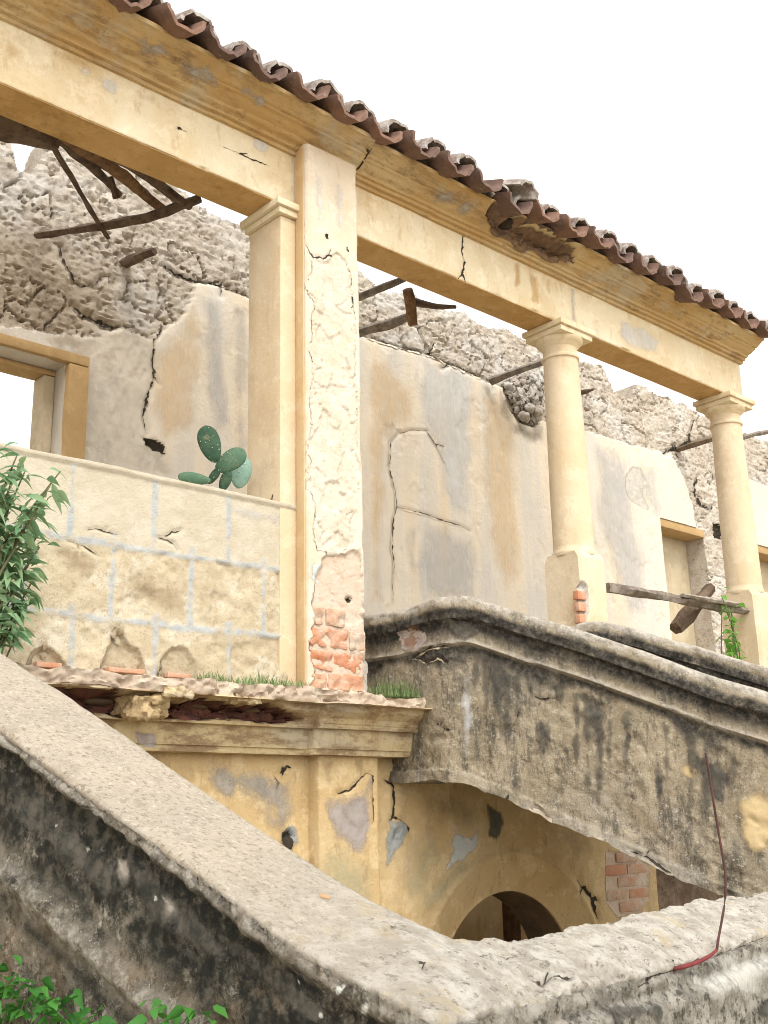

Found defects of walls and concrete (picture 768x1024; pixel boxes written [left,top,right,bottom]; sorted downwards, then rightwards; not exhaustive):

crack [307,247,490,383]
crack [458,237,466,282]
crack [142,330,162,451]
spalling [305,247,366,693]
crack [388,430,470,603]
flaking render [573,580,590,624]
water stain [10,782,121,900]
water stain [128,854,226,958]
peeling [213,770,299,849]
water stain [555,684,611,800]
flaking render [605,849,651,918]
water stain [687,733,737,817]